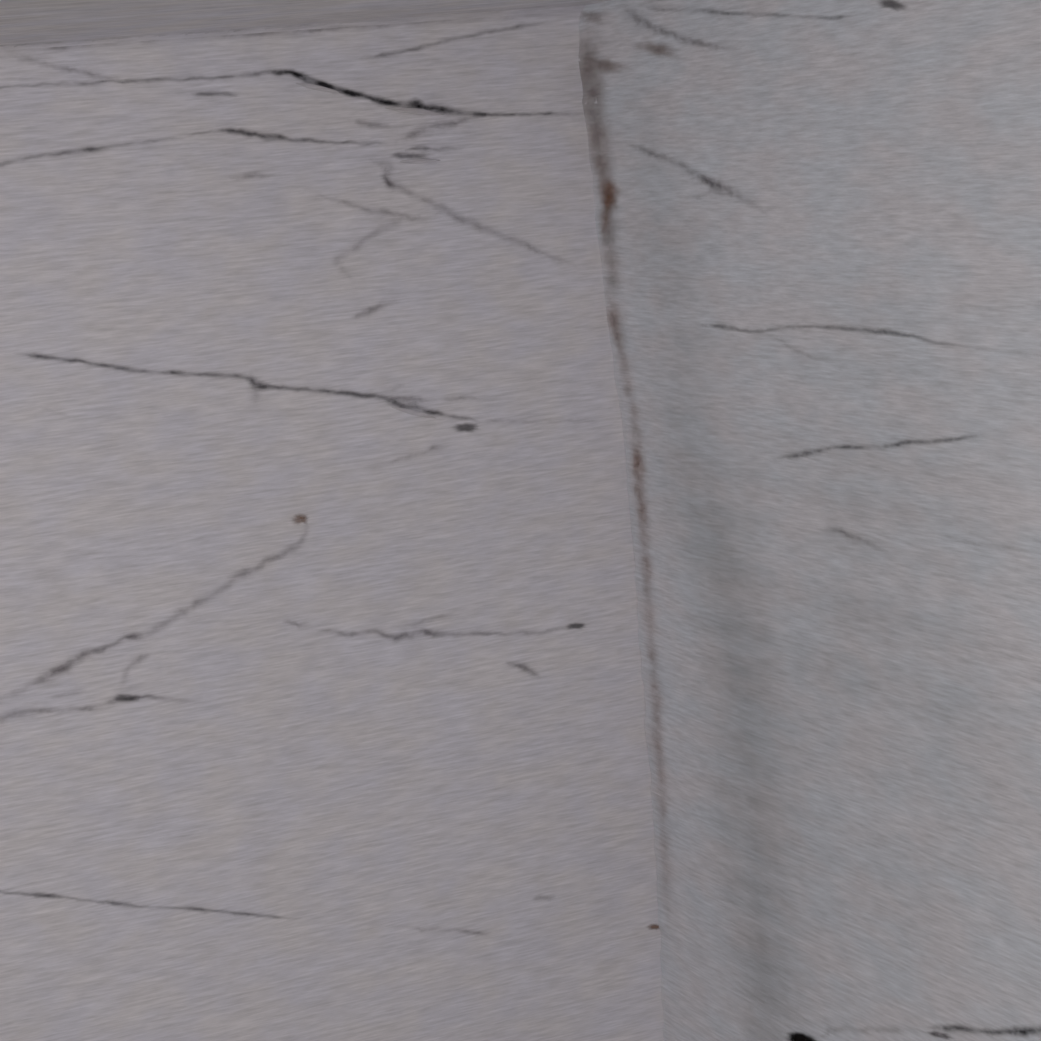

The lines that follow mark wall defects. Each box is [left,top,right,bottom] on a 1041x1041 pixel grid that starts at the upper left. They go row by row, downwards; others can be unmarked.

crack [276,70,487,115]